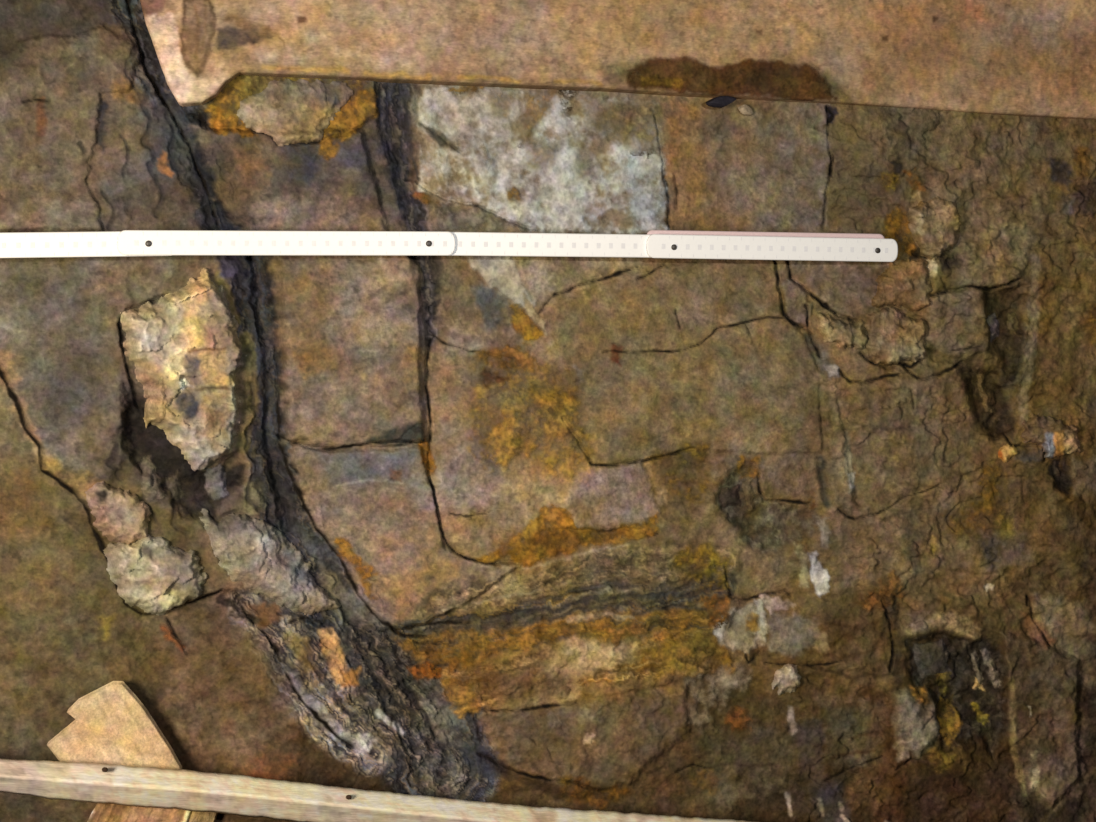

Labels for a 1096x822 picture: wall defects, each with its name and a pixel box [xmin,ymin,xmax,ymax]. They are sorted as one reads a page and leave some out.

damp [417,57,850,234]
crack [539,269,654,313]
crack [569,428,685,466]